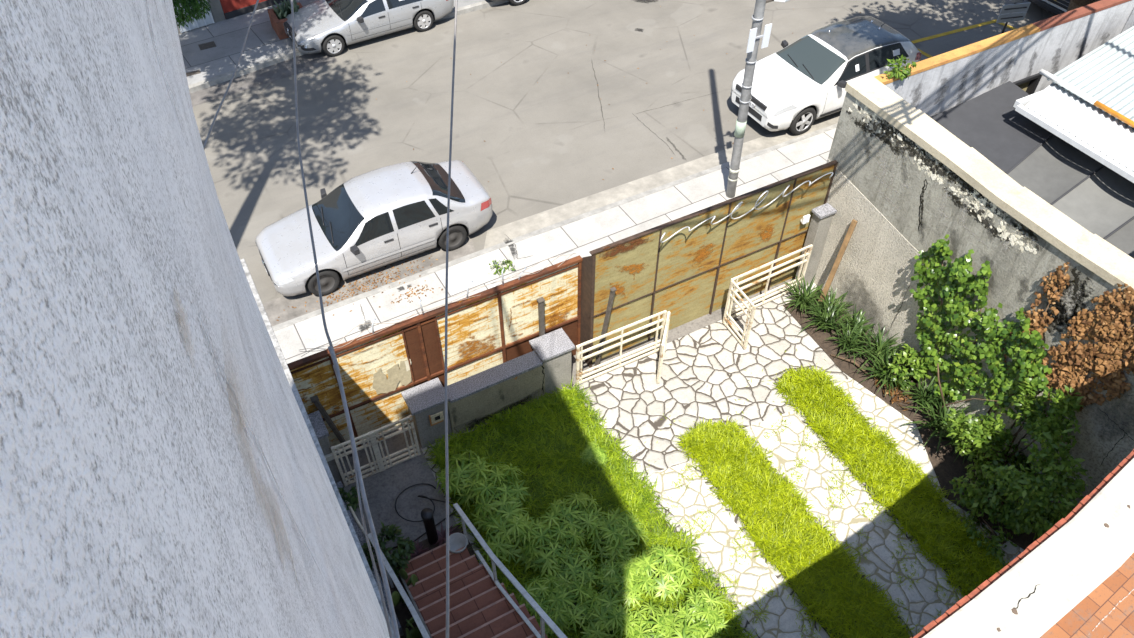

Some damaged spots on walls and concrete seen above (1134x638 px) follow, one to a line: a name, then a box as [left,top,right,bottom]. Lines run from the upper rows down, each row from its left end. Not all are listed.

peeling [846,99,1039,254]
rust [600,238,648,296]
rust [457,334,496,364]